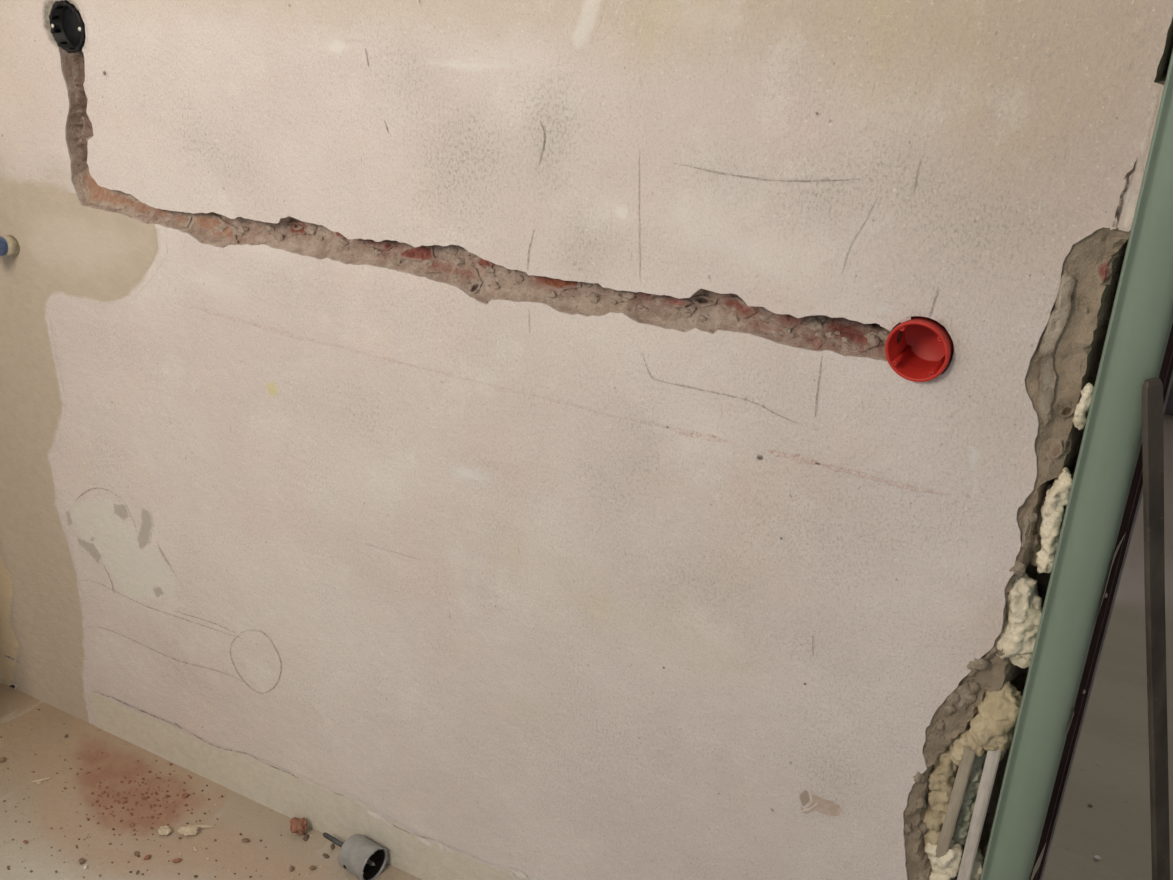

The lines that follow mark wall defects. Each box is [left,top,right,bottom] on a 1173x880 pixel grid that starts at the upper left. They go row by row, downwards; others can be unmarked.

flaking render [1154,18,1173,85]
flaking render [904,227,1130,880]